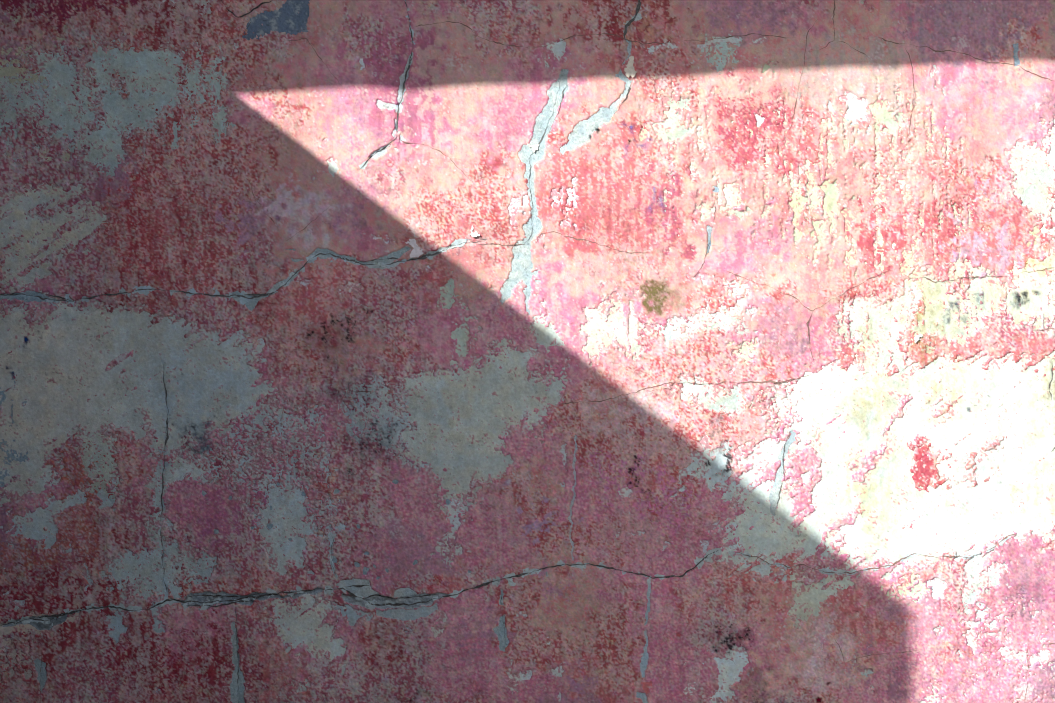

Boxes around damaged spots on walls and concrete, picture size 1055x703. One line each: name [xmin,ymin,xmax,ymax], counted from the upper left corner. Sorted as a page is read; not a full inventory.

peeling [0,25,574,703]
crack [0,84,649,308]
crack [1,359,1017,703]
peeling [550,177,579,231]
damp [640,280,670,315]
peeling [557,23,1055,703]